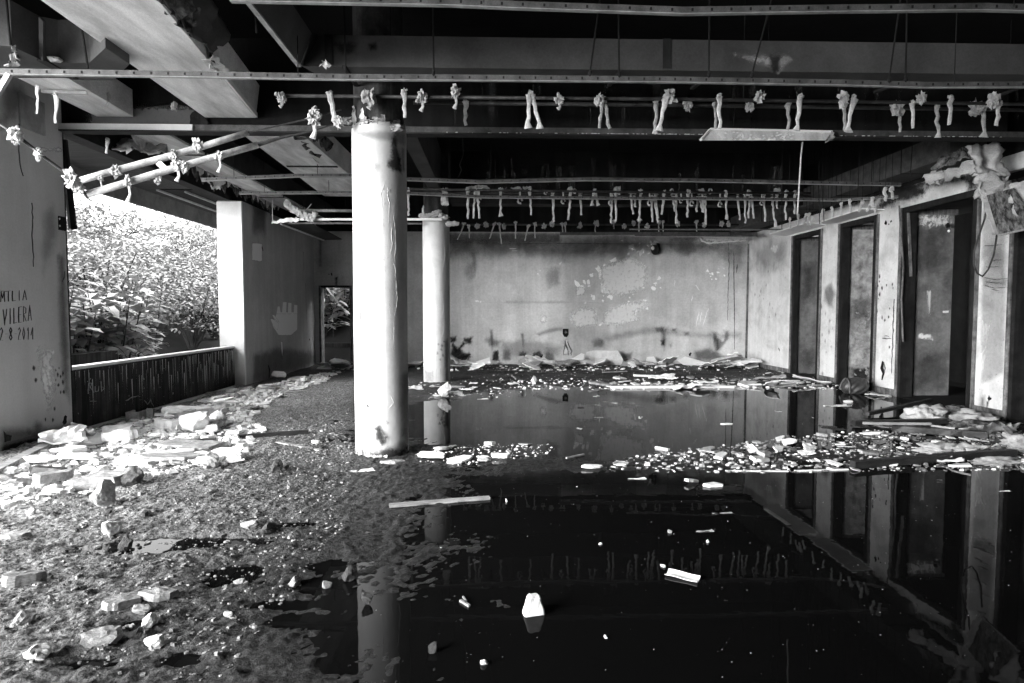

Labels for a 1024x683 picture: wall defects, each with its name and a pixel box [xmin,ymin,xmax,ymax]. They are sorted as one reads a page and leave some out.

peeling [563,240,661,355]
water stain [696,350,720,359]